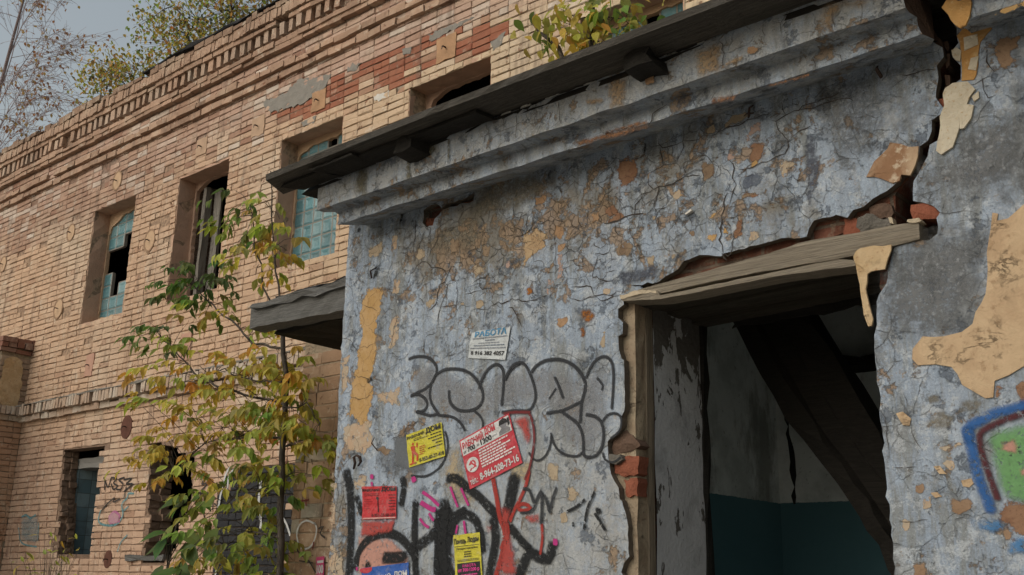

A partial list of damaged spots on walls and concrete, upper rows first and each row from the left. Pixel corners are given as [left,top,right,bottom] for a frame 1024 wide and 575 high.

peeling [934,0,1020,155]
peeling [866,142,919,184]
crack [343,63,854,360]
spalling [869,203,939,227]
peeling [912,204,1024,409]
peeling [340,279,401,455]
spalling [612,430,650,498]
crack [784,417,796,504]
peeling [999,500,1024,540]